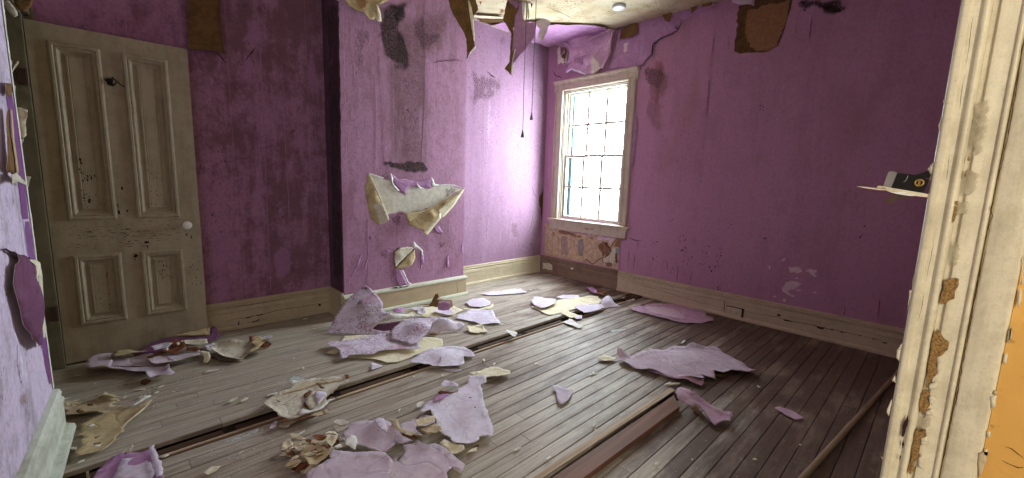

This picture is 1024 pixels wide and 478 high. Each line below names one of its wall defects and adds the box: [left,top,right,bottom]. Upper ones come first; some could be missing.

flaking render [474,15,503,23]
crack [640,20,682,70]
peeling [1,0,54,389]
damp [326,0,463,281]
flaking render [539,192,627,269]
peeling [908,329,949,475]